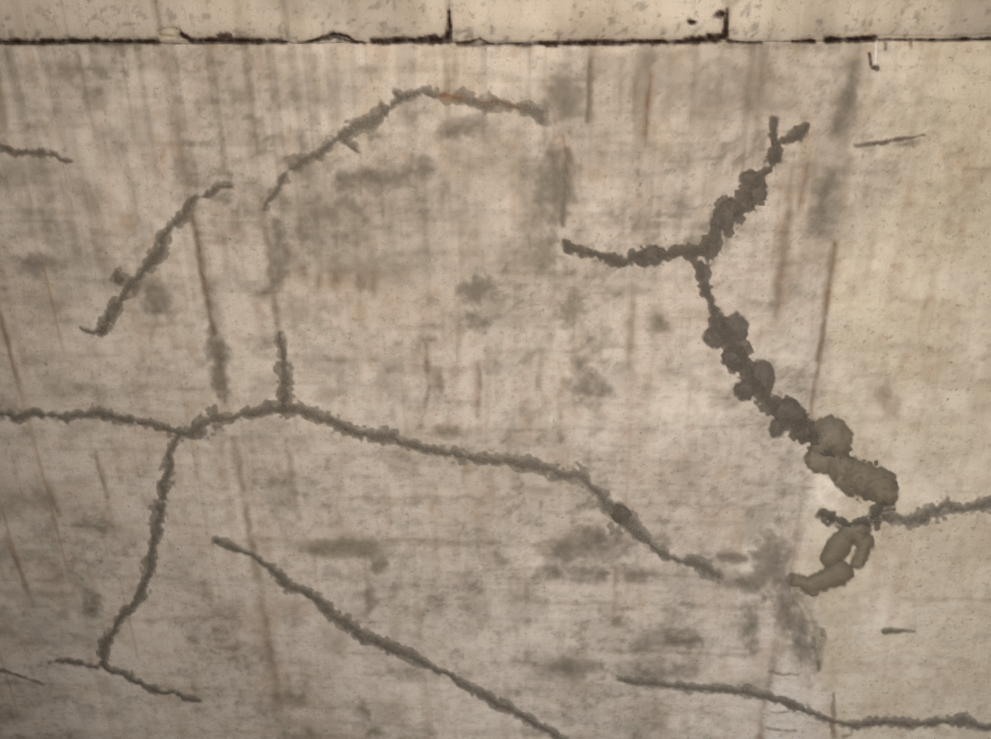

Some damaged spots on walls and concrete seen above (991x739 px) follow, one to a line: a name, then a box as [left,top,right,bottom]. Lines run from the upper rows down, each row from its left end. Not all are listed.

crack [0,144,72,163]
crack [263,85,548,211]
crack [80,182,233,337]
crack [563,116,991,596]
crack [0,331,723,702]
crack [212,537,568,739]
crack [617,676,991,736]